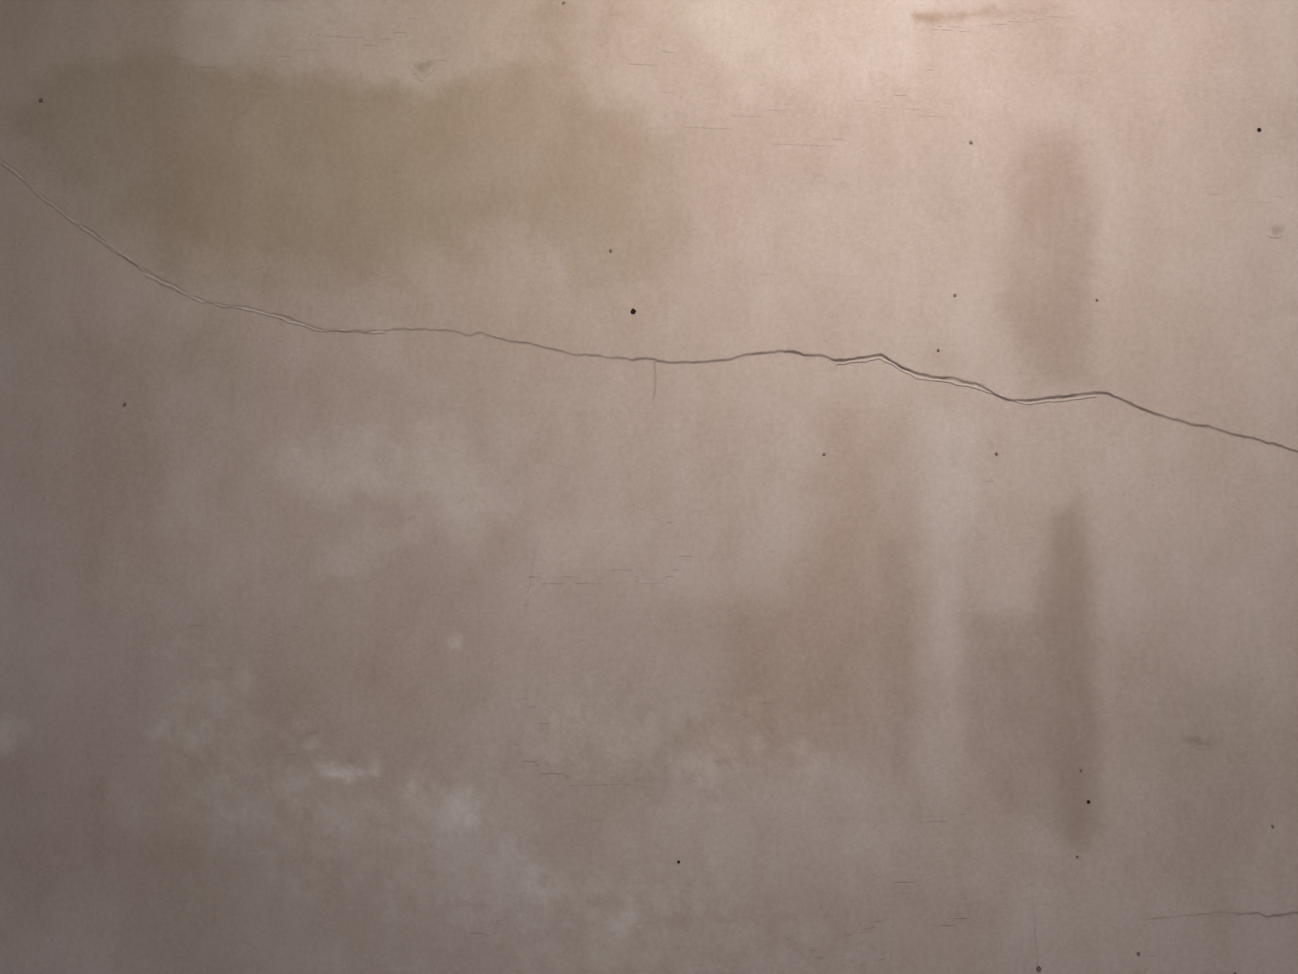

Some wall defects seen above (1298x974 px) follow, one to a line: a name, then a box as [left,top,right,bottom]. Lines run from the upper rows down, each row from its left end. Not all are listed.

crack [0,159,385,334]
leakage [0,0,1124,411]
crack [754,350,1151,412]
leakage [0,288,1298,974]